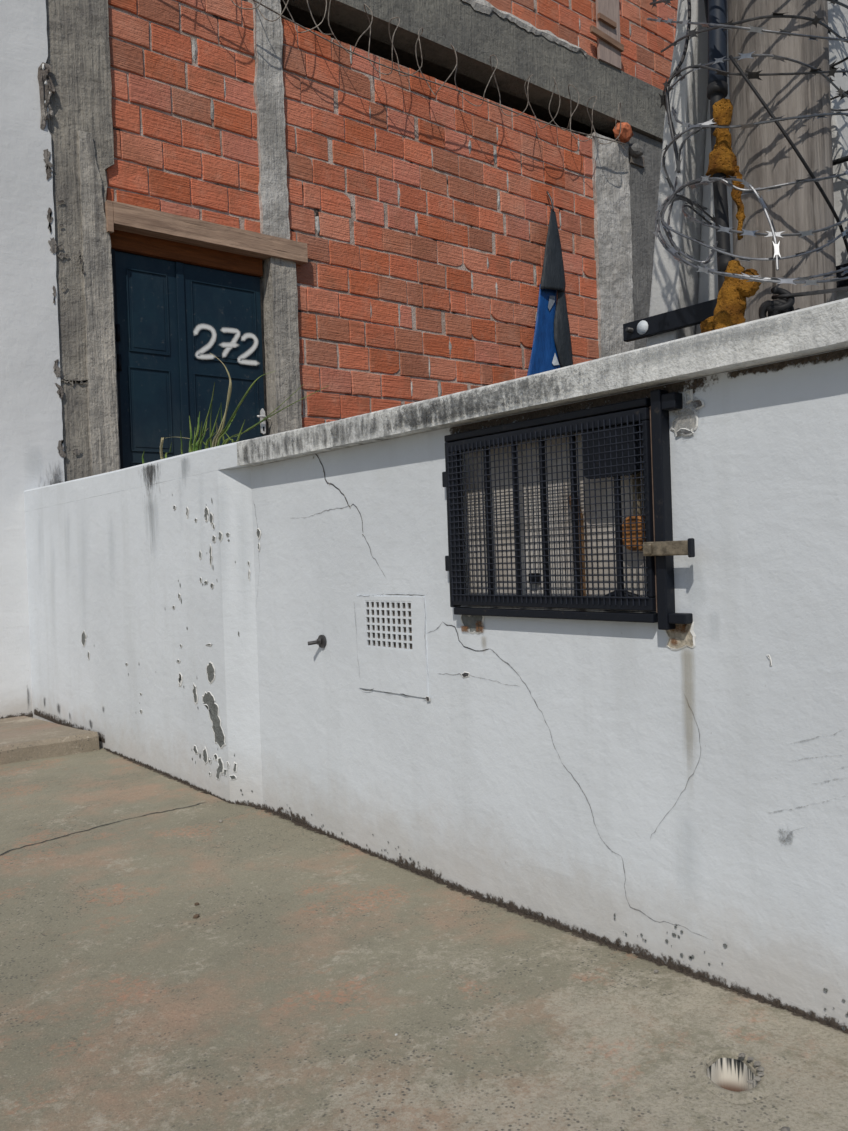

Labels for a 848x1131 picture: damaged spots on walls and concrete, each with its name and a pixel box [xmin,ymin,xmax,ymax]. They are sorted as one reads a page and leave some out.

leakage [237,318,848,460]
peeling [172,494,230,589]
peeling [177,644,253,802]
crack [311,454,704,937]
rust [664,621,696,651]
crack [0,802,205,855]
leakage [1,690,848,1033]